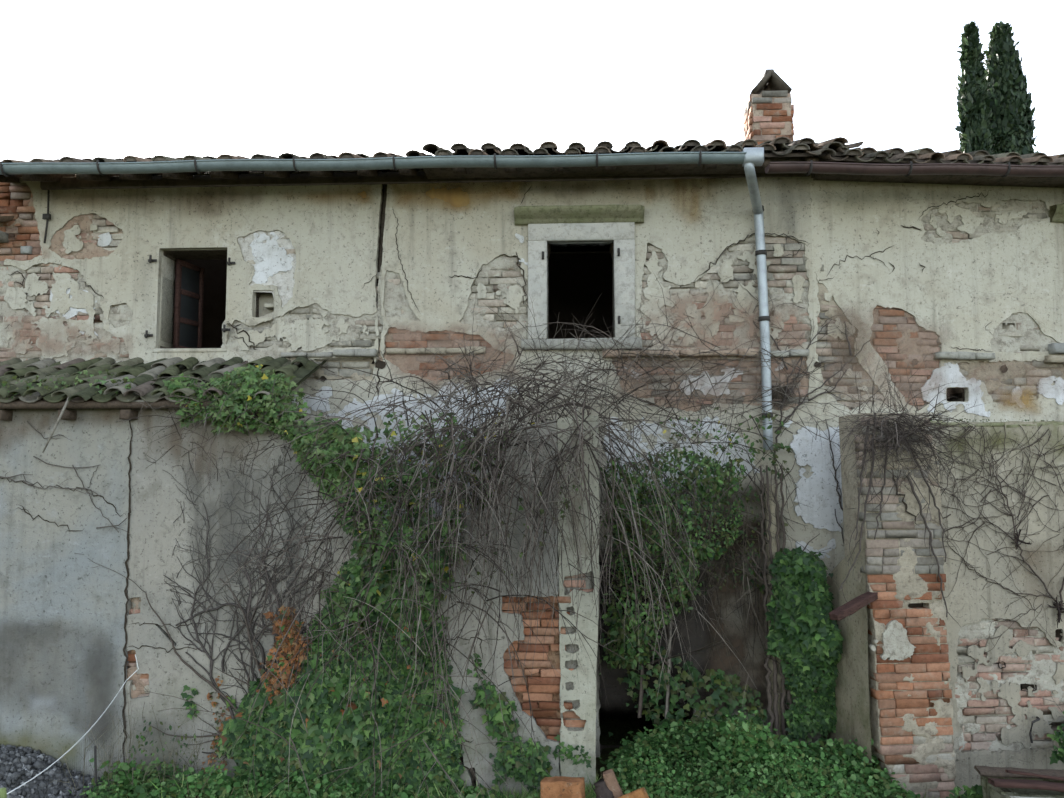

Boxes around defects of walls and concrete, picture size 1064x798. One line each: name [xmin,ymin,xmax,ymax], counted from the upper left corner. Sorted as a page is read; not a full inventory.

spalling [0,182,133,362]
spalling [221,230,528,559]
crack [363,169,420,312]
spalling [604,234,884,559]
spalling [869,306,1064,418]
crack [1,420,208,762]
spalling [502,591,574,743]
spalling [955,618,1064,752]